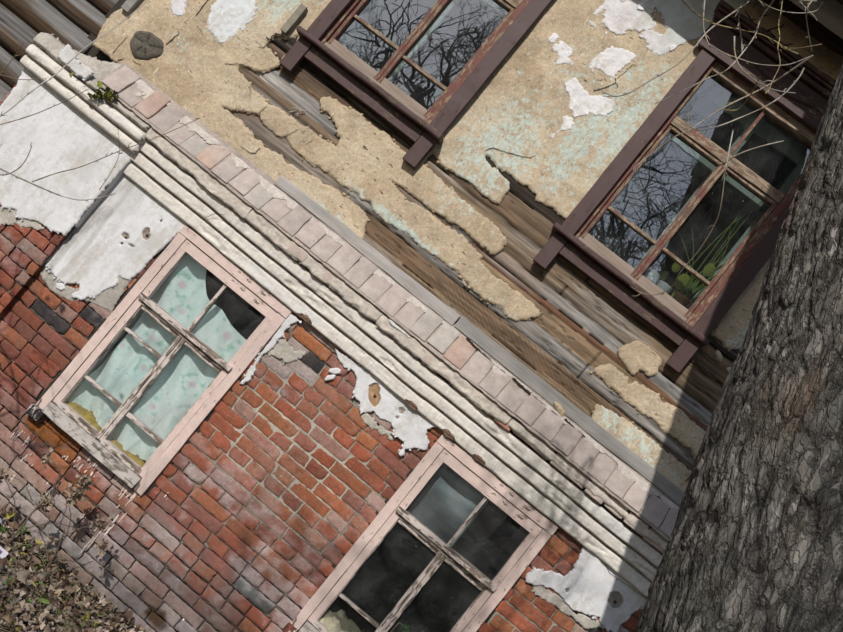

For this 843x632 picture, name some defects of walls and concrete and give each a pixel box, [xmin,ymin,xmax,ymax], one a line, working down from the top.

peeling [57,44,95,81]
peeling [206,0,258,43]
peeling [547,33,573,66]
peeling [589,46,636,78]
peeling [588,0,756,56]
flaking render [238,36,415,153]
peeling [550,78,615,139]
peeling [0,68,188,301]
flaking render [145,108,739,551]
peeling [525,547,646,632]